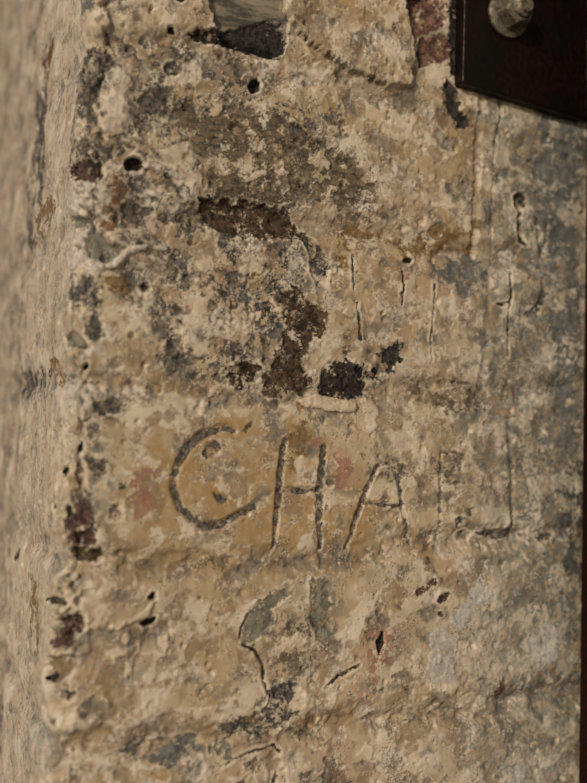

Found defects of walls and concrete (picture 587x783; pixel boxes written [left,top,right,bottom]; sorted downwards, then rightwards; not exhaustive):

spalling [209,0,289,43]
flaking render [407,0,451,68]
crack [239,616,271,698]
crack [328,664,360,685]
crack [225,743,281,765]